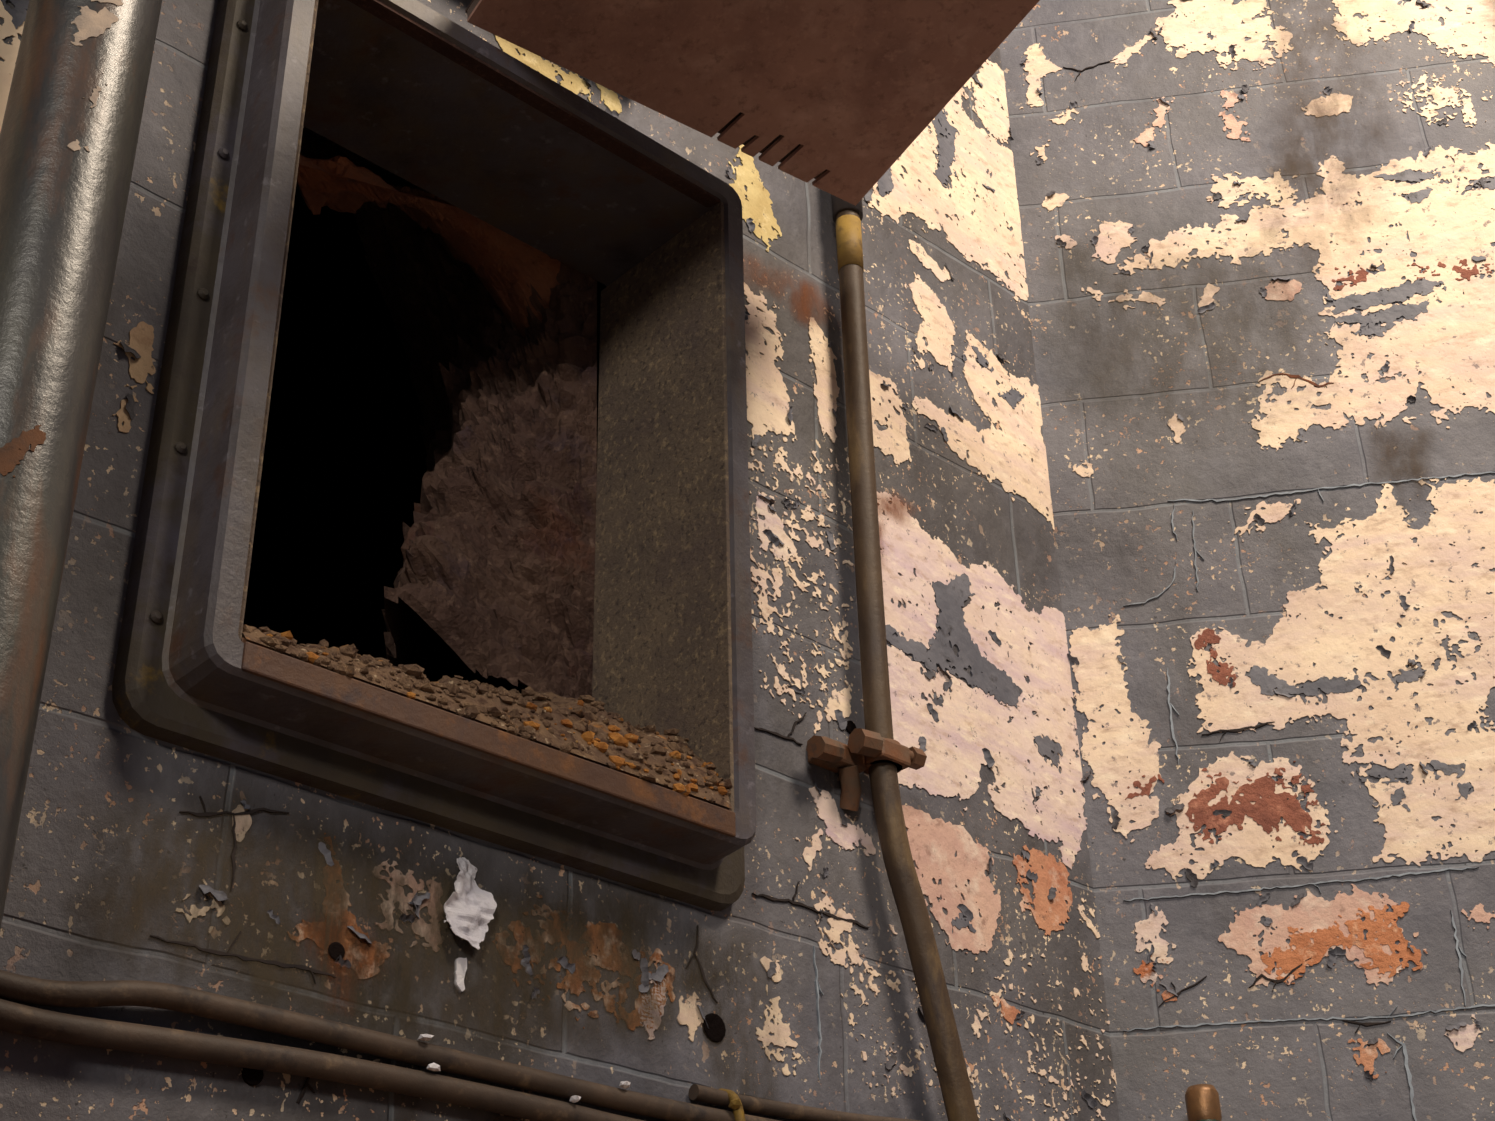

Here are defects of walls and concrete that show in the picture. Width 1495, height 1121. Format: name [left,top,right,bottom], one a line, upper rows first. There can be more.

peeling [0,0,29,132]
peeling [1110,0,1293,142]
peeling [1328,0,1495,67]
peeling [727,145,782,252]
peeling [864,43,1082,530]
peeling [1055,69,1495,451]
peeling [744,283,863,734]
peeling [1073,460,1094,477]
peeling [795,782,936,1096]